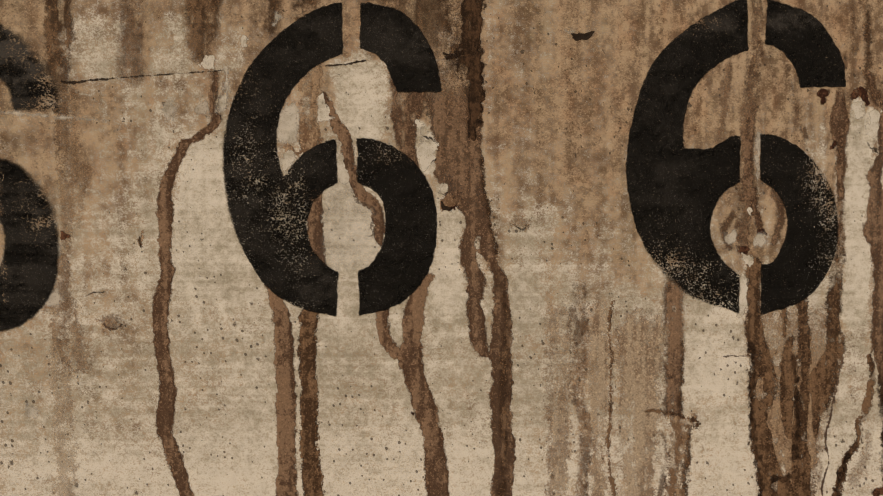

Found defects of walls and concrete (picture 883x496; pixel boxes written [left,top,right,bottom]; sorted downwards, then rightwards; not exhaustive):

water stain [118,0,143,80]
crack [61,70,221,85]
water stain [186,0,222,61]
water stain [264,0,280,34]
peeling [415,119,439,172]
peeling [851,101,883,153]
corrosion [152,71,227,496]
corrosion [306,190,326,270]
corrosion [426,0,517,496]
corrosion [720,71,883,496]
corrosion [265,280,324,496]
corrosion [375,273,449,496]